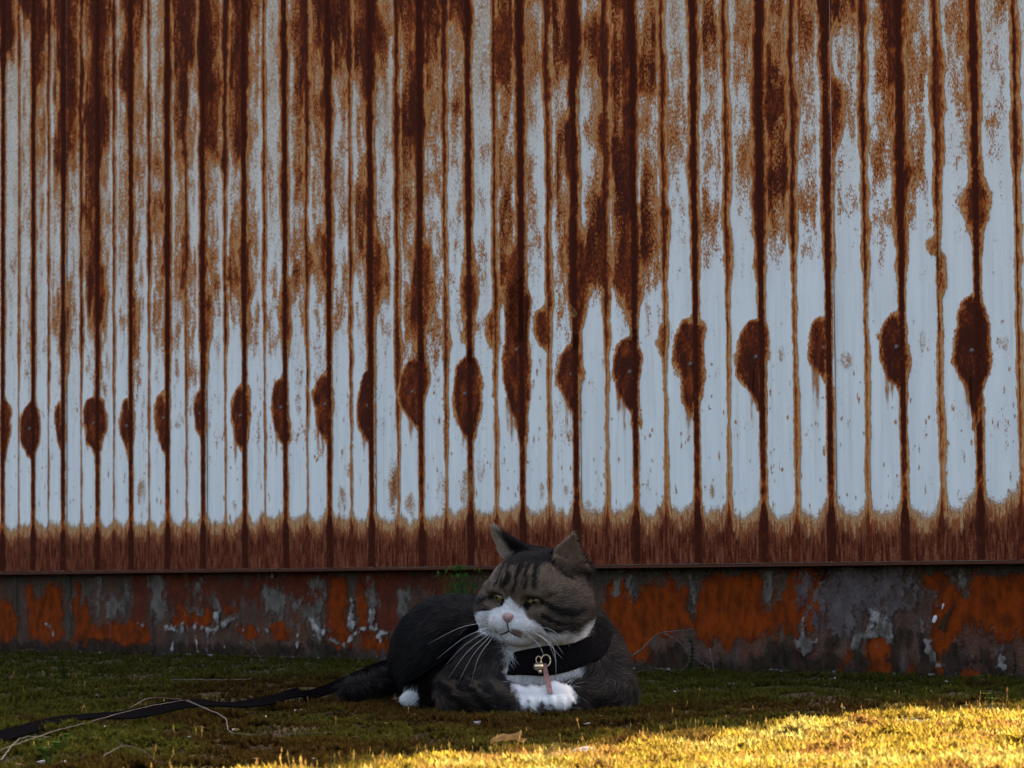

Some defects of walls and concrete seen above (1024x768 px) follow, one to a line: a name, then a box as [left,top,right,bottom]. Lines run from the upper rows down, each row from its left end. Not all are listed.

corrosion [0,0,1024,572]
corrosion [602,567,826,666]
peeling [794,617,818,656]
peeling [847,617,893,650]
peeling [920,603,946,668]
corrosion [920,568,1024,677]
peeling [990,644,1007,671]